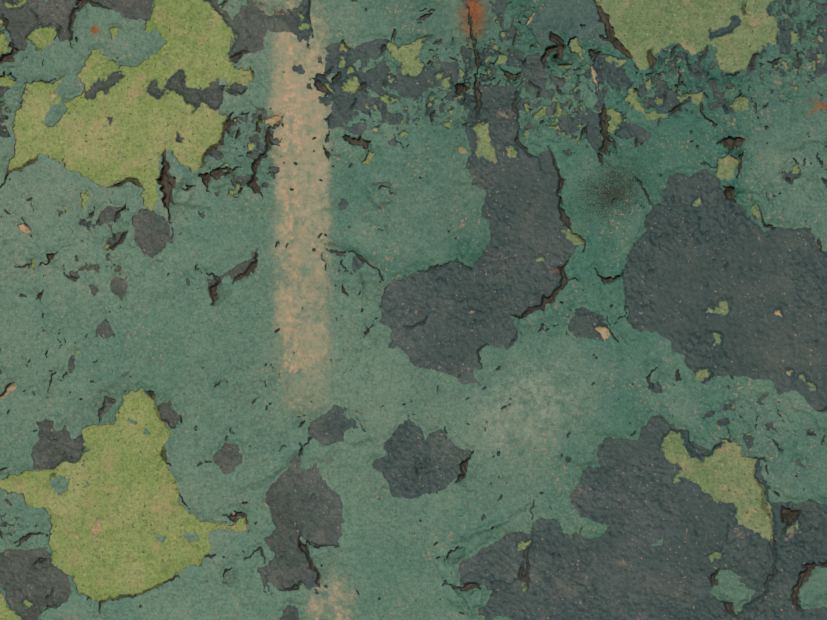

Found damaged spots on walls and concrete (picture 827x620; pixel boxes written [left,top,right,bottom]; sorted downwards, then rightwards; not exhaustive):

corrosion [450,0,497,50]
crack [465,1,489,122]
peeling [0,0,311,267]
crack [4,203,34,238]
crack [19,291,50,307]
crack [15,251,80,282]
peeling [110,273,128,300]
peeling [309,0,827,422]
peeling [0,384,254,620]
peeling [244,405,366,620]
peeling [372,414,483,499]
peeling [443,413,827,620]